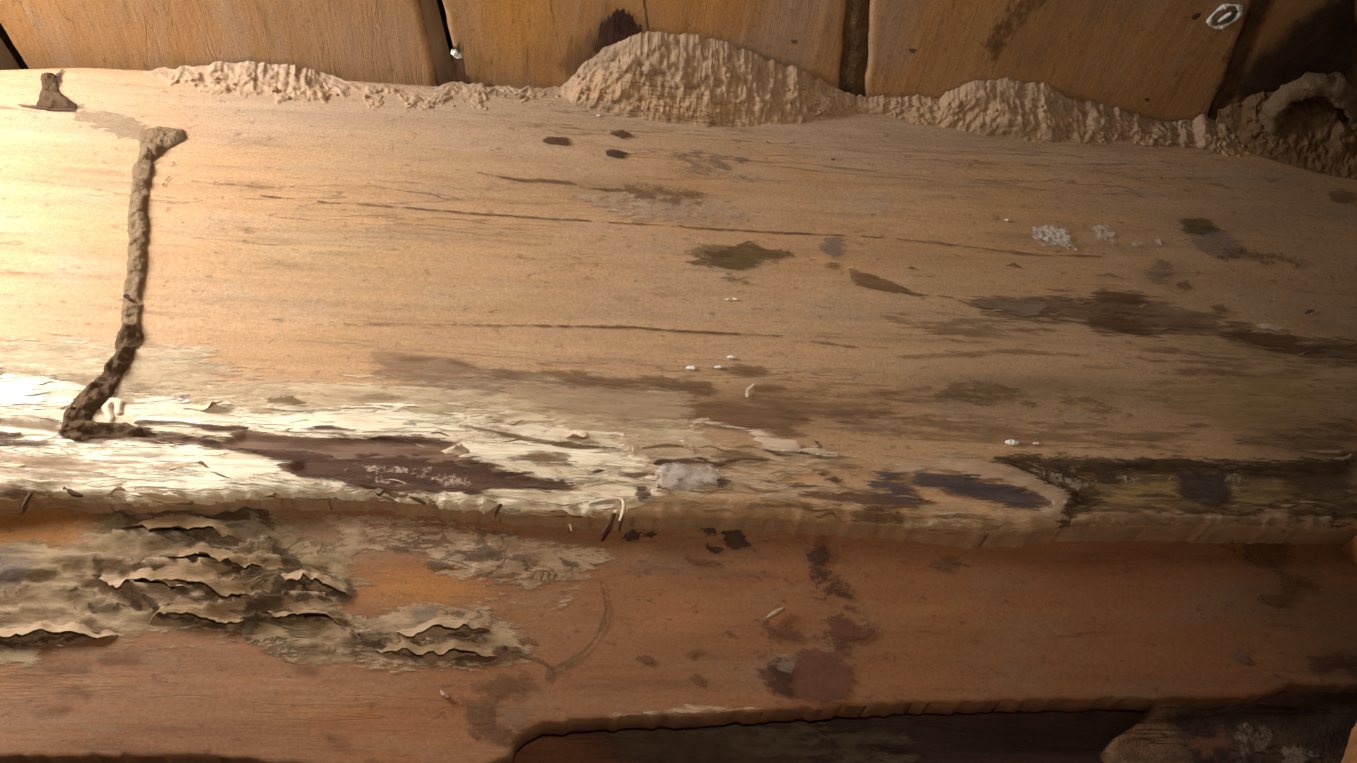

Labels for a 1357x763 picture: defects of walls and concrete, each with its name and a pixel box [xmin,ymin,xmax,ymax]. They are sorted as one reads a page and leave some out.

damp [686,241,794,275]
peeling [0,331,1071,673]